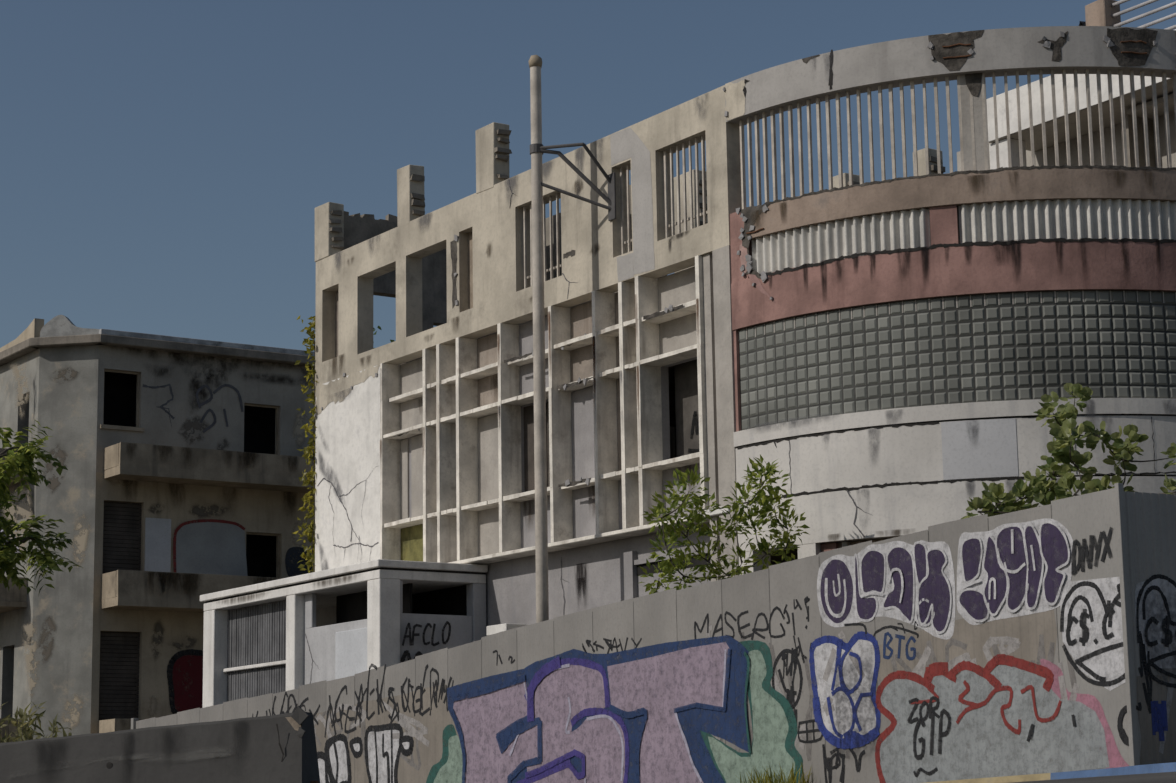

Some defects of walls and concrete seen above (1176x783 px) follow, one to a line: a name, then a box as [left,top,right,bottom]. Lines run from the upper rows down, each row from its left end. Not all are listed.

spalling [927,30,984,96]
spalling [1038,31,1068,61]
spalling [1103,27,1158,67]
spalling [736,202,776,303]
water stain [821,254,875,289]
water stain [903,246,928,277]
water stain [999,240,1020,267]
crack [1095,469,1176,477]
crack [318,466,378,562]
crack [783,476,1037,537]